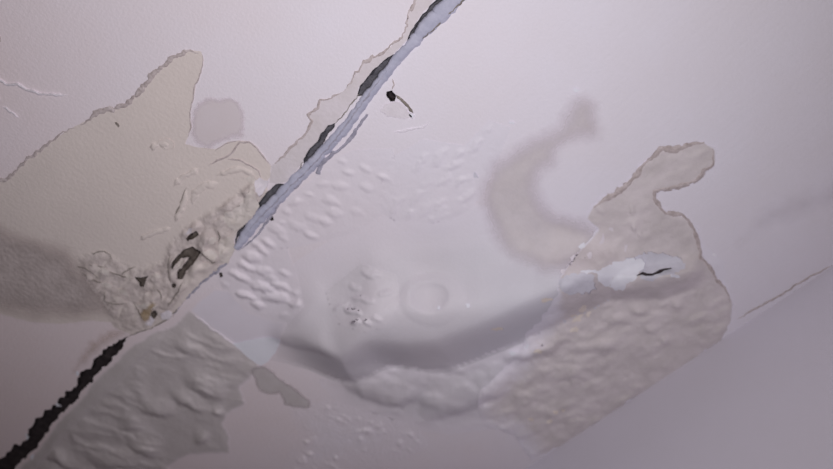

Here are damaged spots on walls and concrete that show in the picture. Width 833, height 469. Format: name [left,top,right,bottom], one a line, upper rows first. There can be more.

crack [408,0,442,39]
peeling [0,0,433,335]
crack [259,54,394,208]
damp [488,105,593,267]
damp [0,235,100,312]
peeling [478,141,734,460]
crack [0,315,174,469]